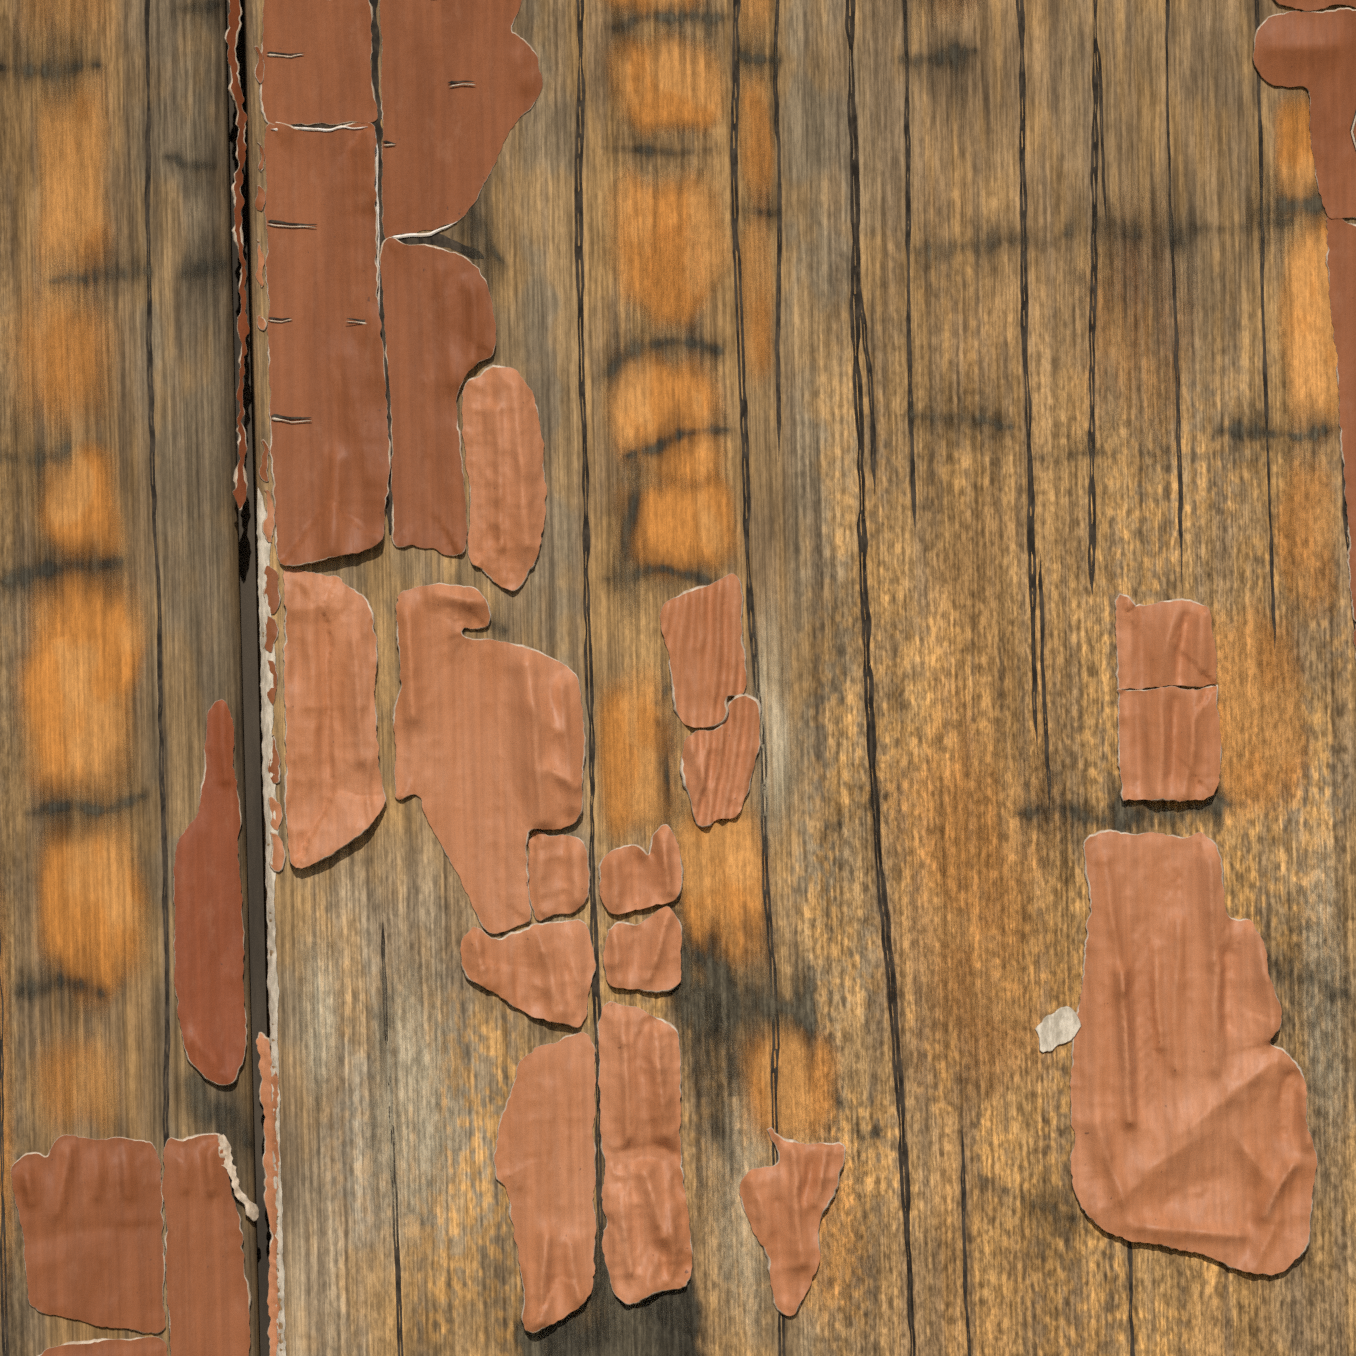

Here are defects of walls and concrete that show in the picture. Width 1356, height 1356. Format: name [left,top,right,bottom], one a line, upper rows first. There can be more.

peeling [11,0,693,1356]
peeling [659,573,762,828]
crack [730,0,782,1165]
crack [845,0,916,1356]
crack [1016,0,1051,815]
crack [1088,0,1107,594]
peeling [1114,593,1222,802]
peeling [1253,0,1356,659]
crack [778,1312,786,1356]
peeling [739,1127,846,1316]
peeling [1035,829,1318,1276]